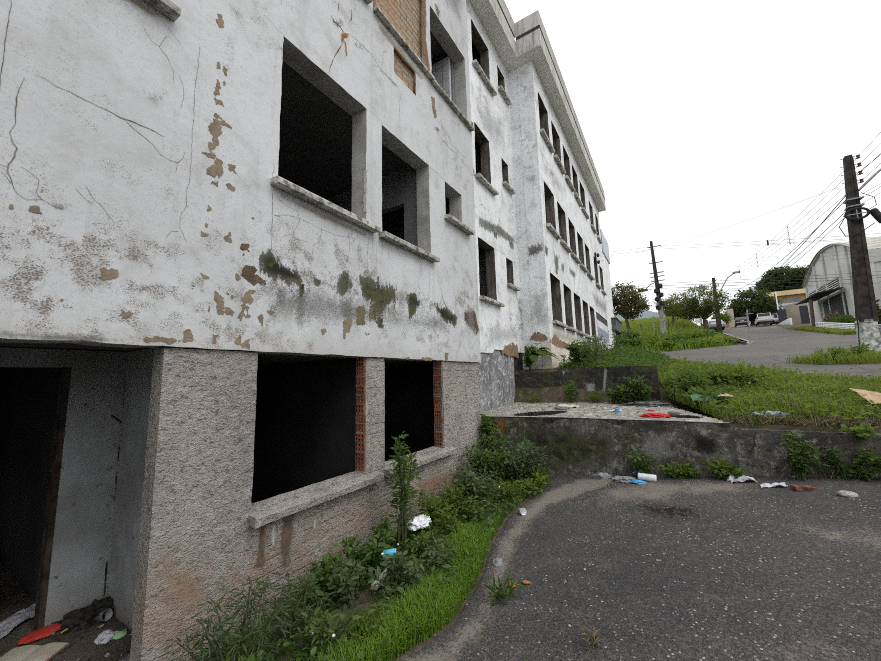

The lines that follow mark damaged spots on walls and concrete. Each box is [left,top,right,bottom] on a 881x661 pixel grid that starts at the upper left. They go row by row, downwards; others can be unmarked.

crack [329,6,402,98]
crack [0,2,62,209]
crack [49,24,200,242]
peeling [201,62,237,191]
peeling [208,232,274,326]
peeling [235,335,250,349]
leakage [465,312,477,333]
spalling [502,342,519,358]
spalling [530,332,570,351]